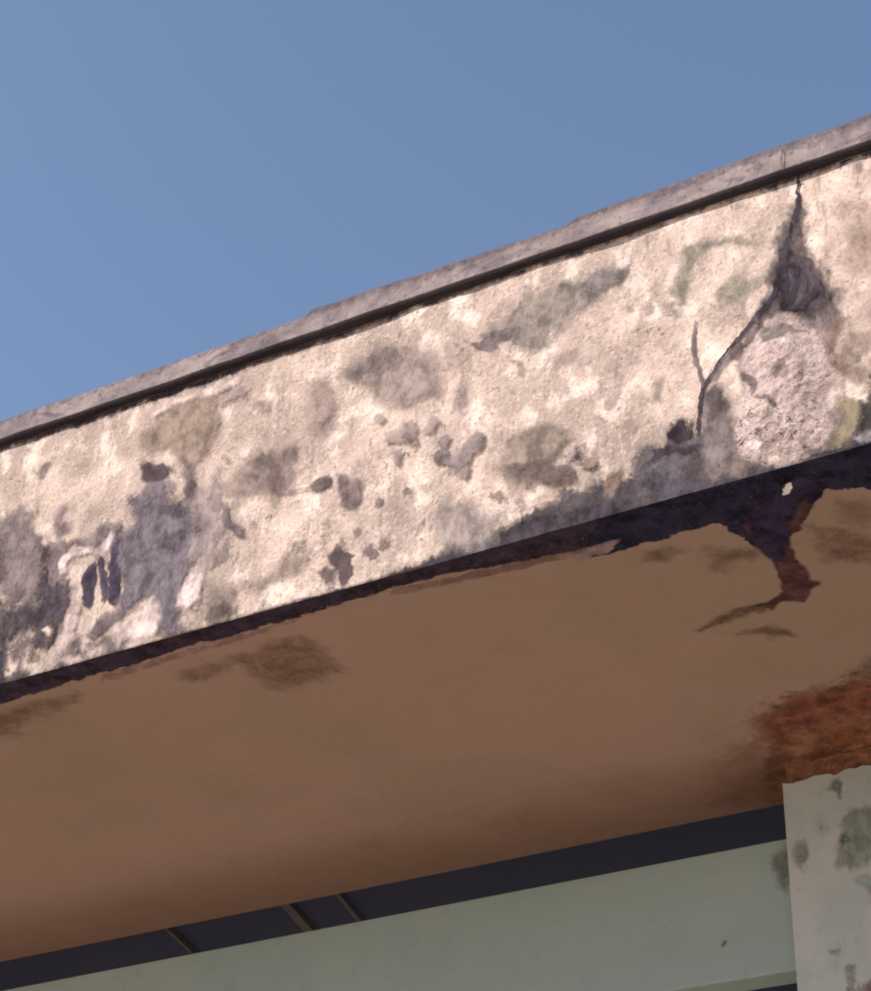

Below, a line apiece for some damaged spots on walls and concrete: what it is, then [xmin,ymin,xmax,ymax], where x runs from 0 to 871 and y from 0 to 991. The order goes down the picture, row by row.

leakage [760,151,871,190]
crack [690,145,825,436]
spalling [785,292,838,332]
leakage [0,203,871,733]
corrosion [757,666,871,805]